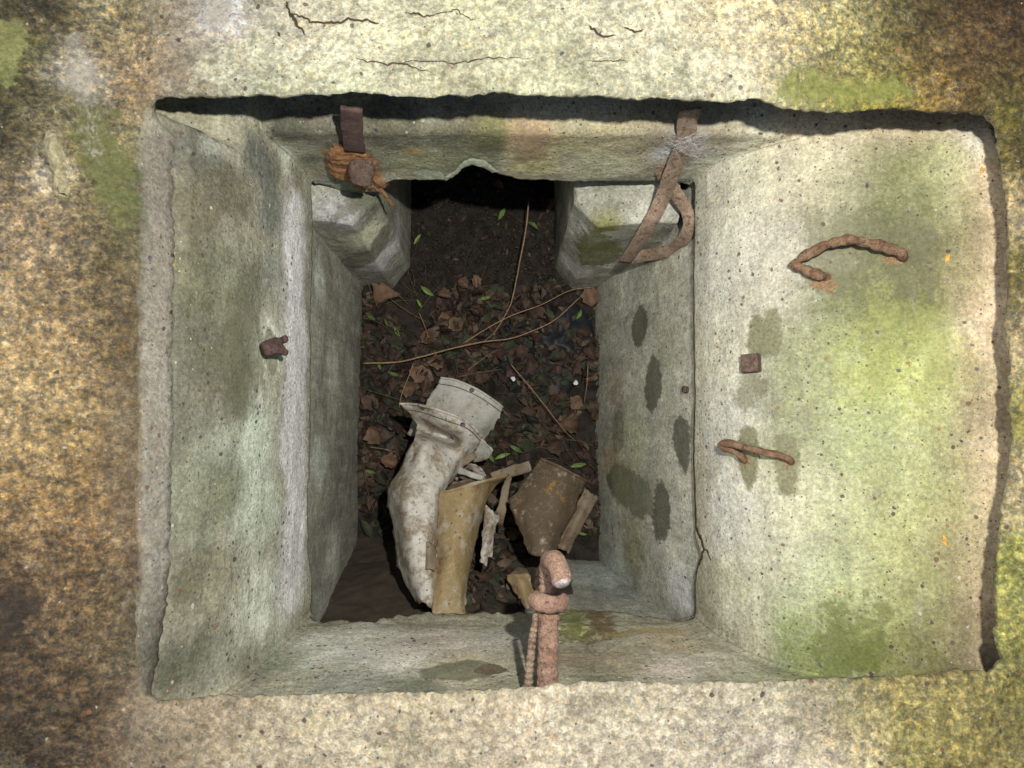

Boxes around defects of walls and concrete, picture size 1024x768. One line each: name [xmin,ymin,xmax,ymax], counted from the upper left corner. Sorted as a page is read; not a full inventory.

crack [277,2,379,37]
crack [405,9,474,20]
crack [357,57,529,71]
crack [588,25,644,62]
damp [632,304,648,347]
damp [746,309,782,357]
damp [644,355,662,413]
damp [672,416,691,475]
crack [676,255,711,621]
damp [737,427,759,489]
damp [773,434,800,496]
damp [606,464,671,540]